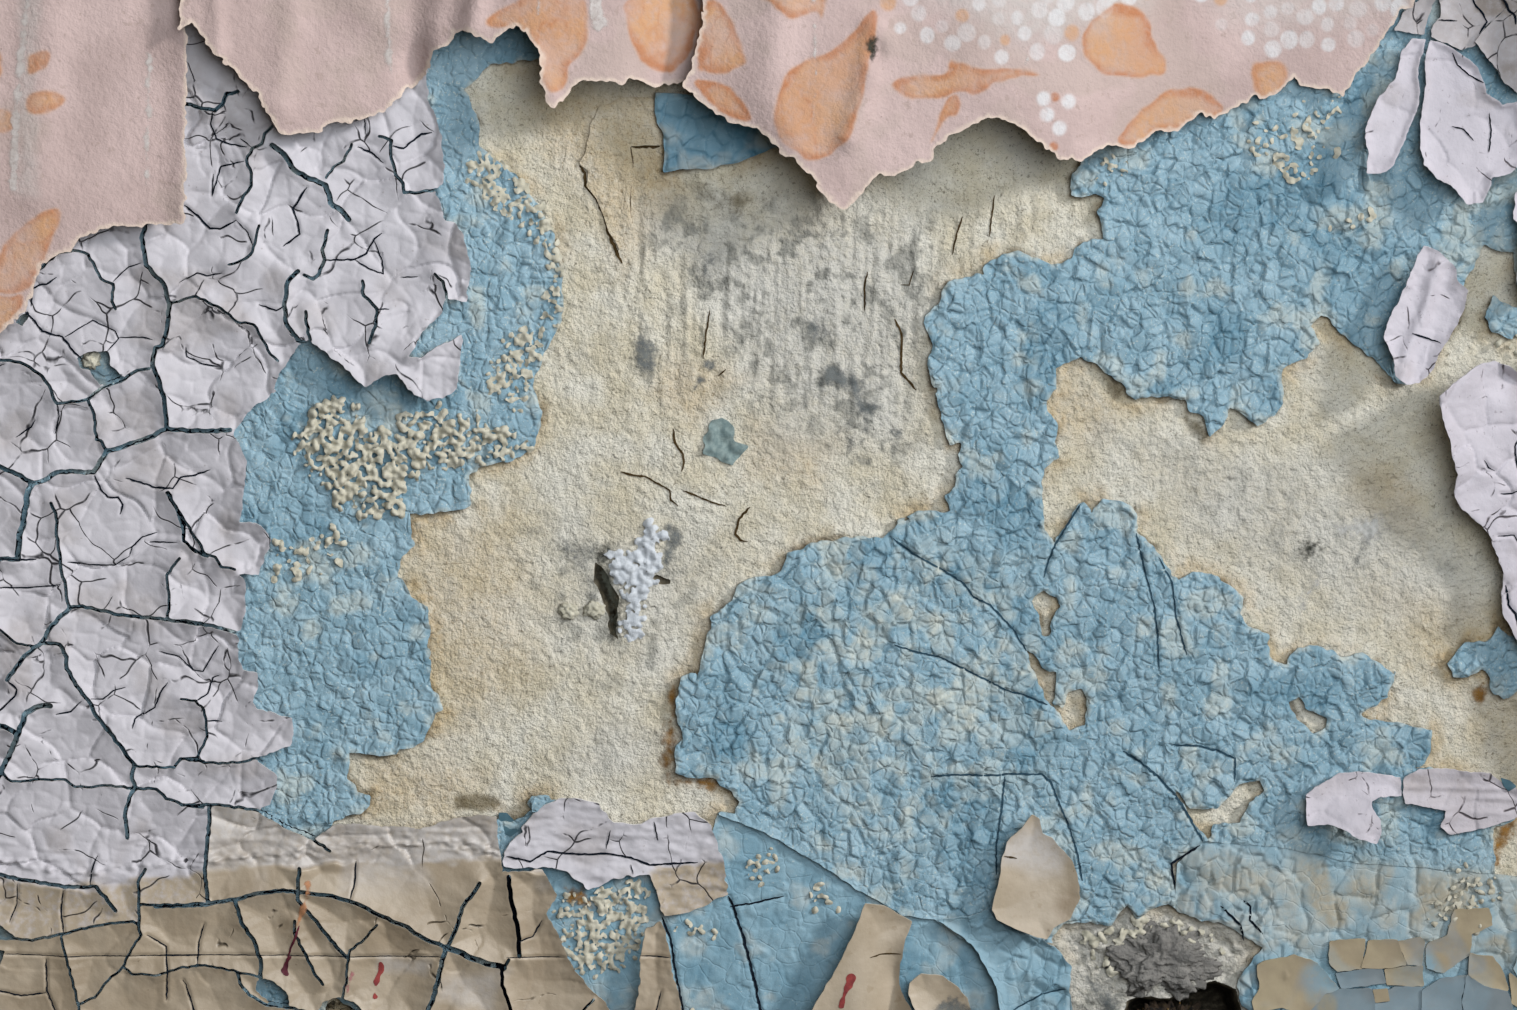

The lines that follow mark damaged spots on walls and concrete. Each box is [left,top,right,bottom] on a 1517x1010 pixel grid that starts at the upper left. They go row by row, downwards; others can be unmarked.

crack [703,310,726,376]
peeling [0,26,564,1010]
crack [0,23,698,1010]
crack [621,429,750,542]
peeling [497,0,1517,1010]
crack [1484,442,1517,495]
leakage [565,517,681,642]
crack [1505,585,1517,621]
crack [728,896,783,1010]